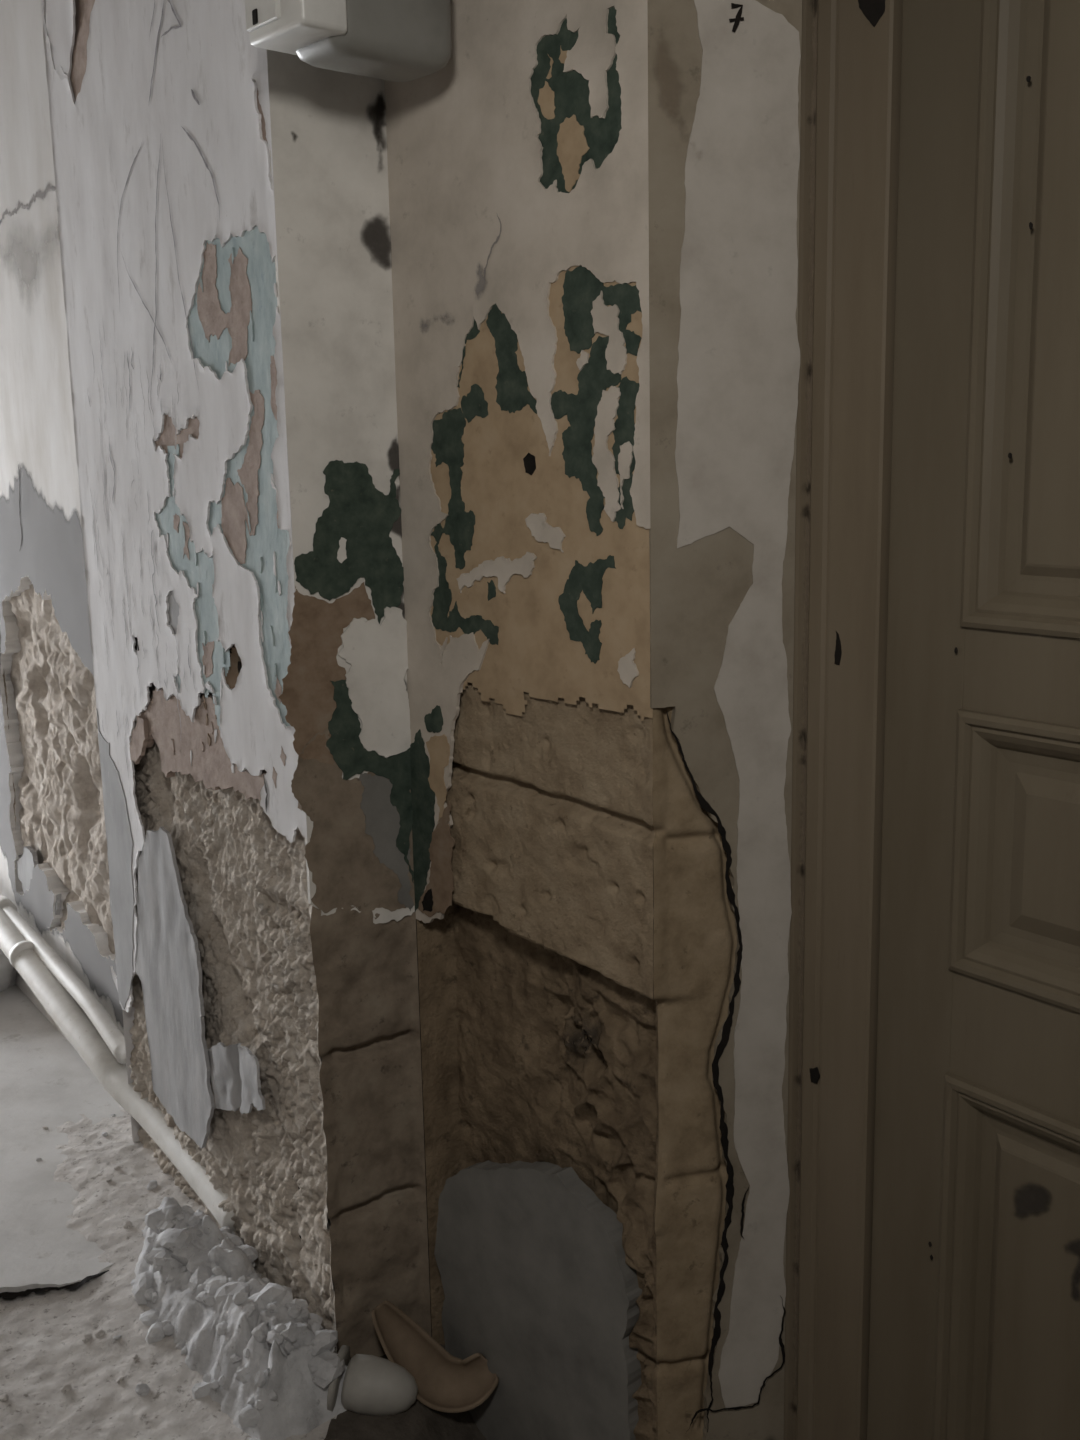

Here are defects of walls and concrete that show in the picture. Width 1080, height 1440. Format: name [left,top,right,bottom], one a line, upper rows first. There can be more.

flaking render [46,0,95,101]
spalling [3,584,115,954]
spalling [129,0,801,1440]
crack [666,712,786,1432]